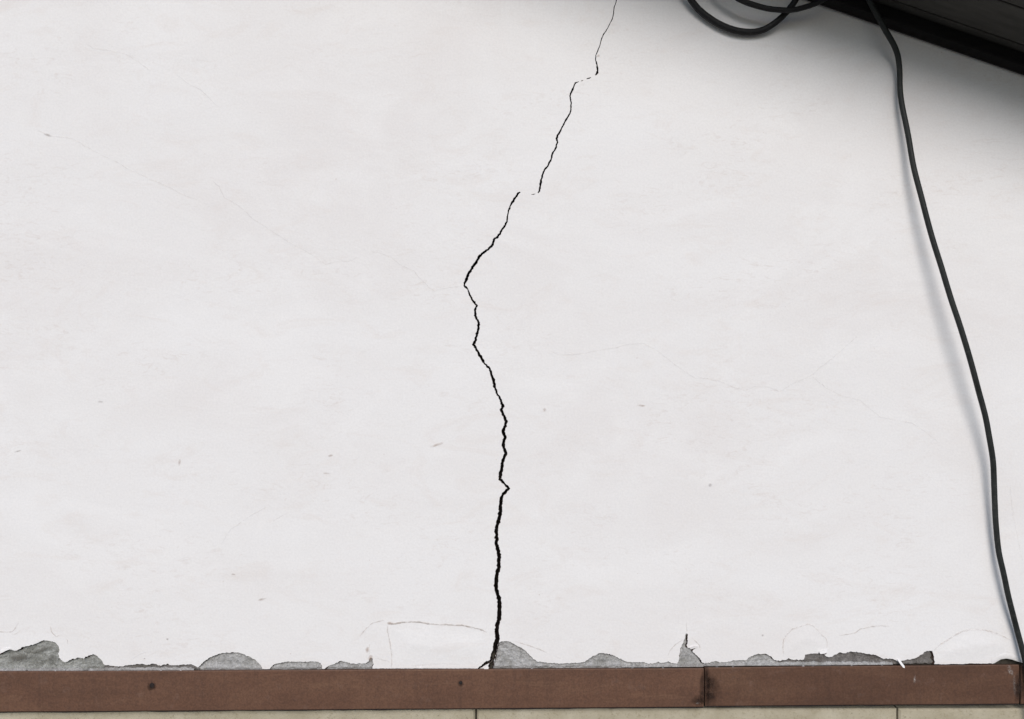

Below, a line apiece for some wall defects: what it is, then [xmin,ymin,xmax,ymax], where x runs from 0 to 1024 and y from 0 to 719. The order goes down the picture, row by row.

crack [463,0,617,669]
spalling [0,640,374,671]
spalling [484,634,935,669]